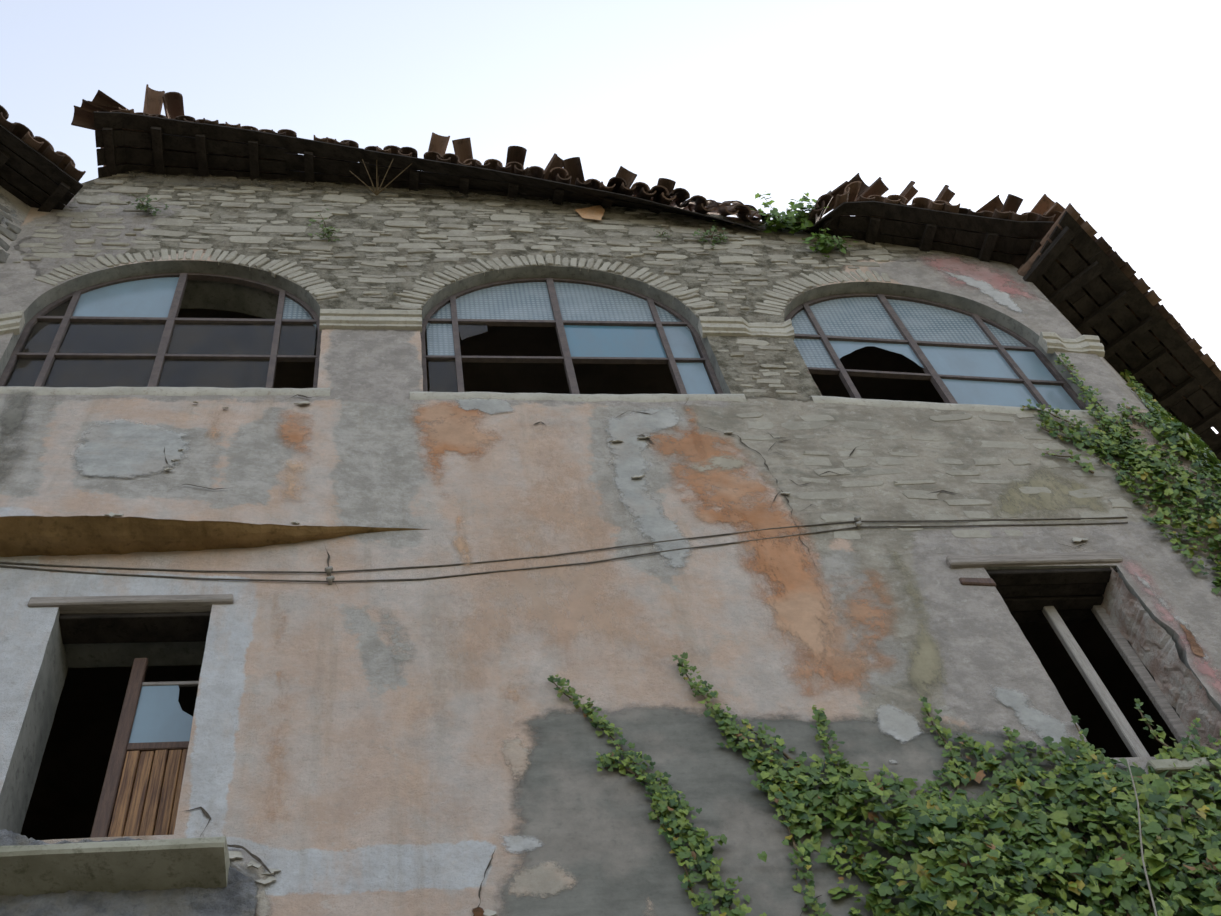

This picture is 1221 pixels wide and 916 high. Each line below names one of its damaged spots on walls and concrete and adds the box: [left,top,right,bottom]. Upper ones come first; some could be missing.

peeling [948,273,1022,312]
peeling [606,406,692,567]
crack [686,415,864,568]
spalling [1135,574,1209,660]
spalling [0,829,142,846]
spalling [0,844,281,916]
spalling [472,687,1091,916]